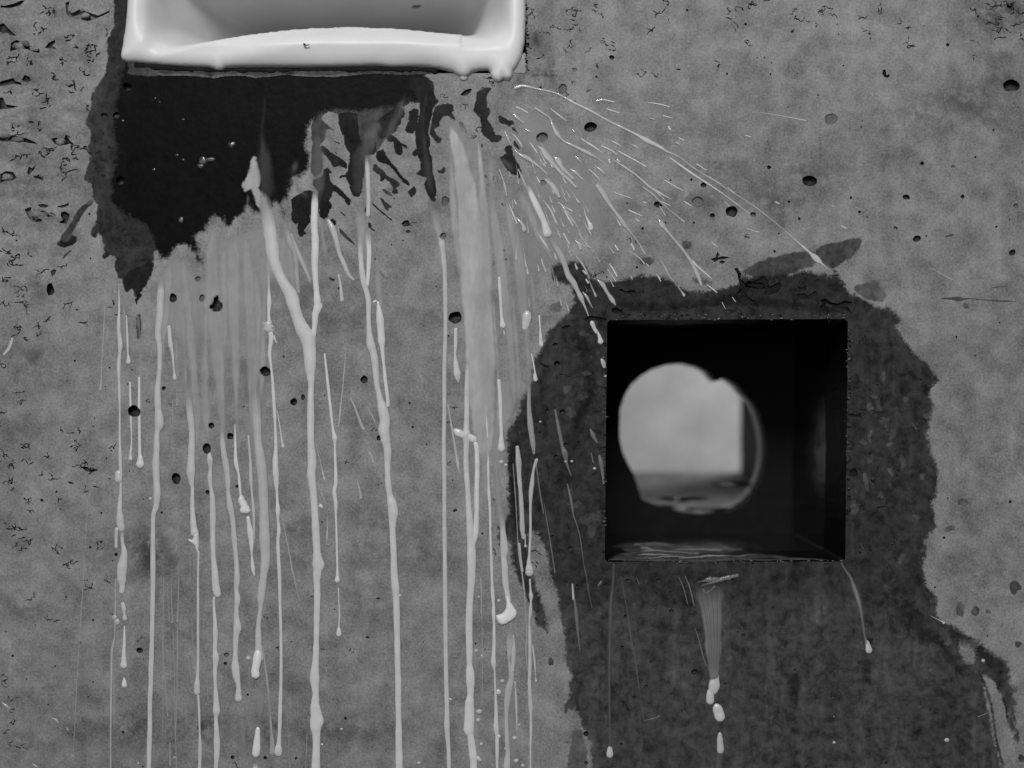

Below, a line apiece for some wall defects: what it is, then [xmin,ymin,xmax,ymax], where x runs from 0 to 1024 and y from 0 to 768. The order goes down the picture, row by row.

damp [57,0,467,439]
damp [473,87,1024,768]